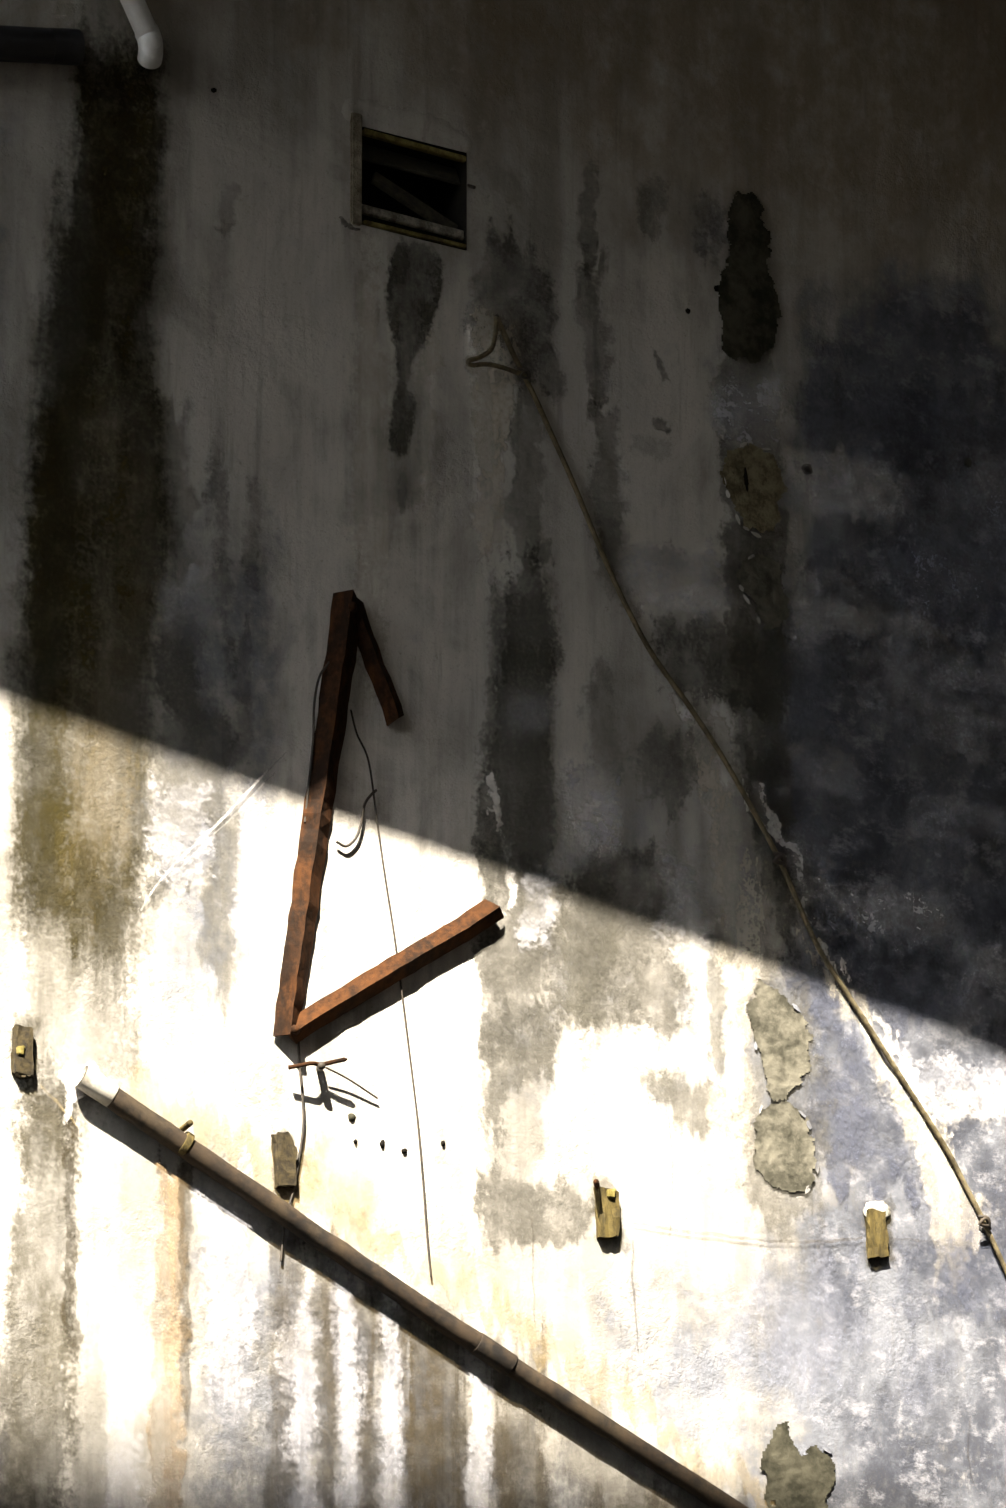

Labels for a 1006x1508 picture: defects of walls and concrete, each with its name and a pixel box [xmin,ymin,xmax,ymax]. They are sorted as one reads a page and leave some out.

leakage [386,242,442,457]
spalling [718,191,783,364]
leakage [7,43,238,970]
spalling [720,442,788,538]
leakage [14,1083,81,1219]
spalling [746,979,820,1194]
leakage [0,1209,76,1508]
leakage [322,1273,468,1508]
leakage [491,1376,516,1508]
spalling [760,1421,835,1508]